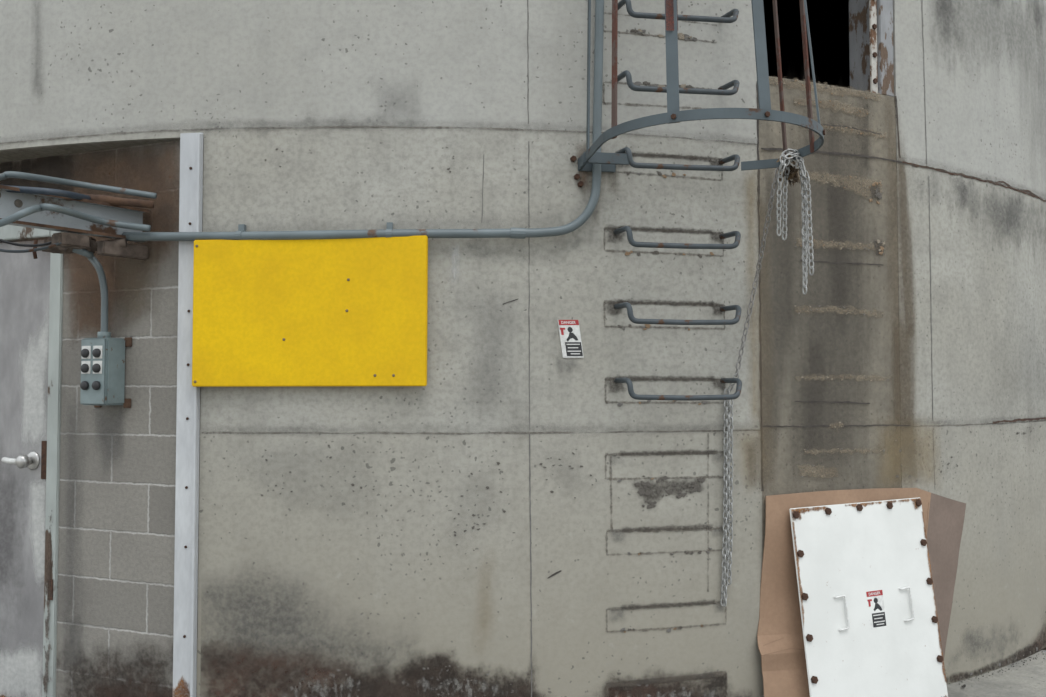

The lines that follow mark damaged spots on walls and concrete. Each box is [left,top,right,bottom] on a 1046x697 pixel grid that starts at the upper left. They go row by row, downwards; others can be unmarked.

spalling [635,477,705,509]
water stain [205,590,535,697]
water stain [66,650,172,697]
corrosion [172,679,190,697]
water stain [607,676,726,697]